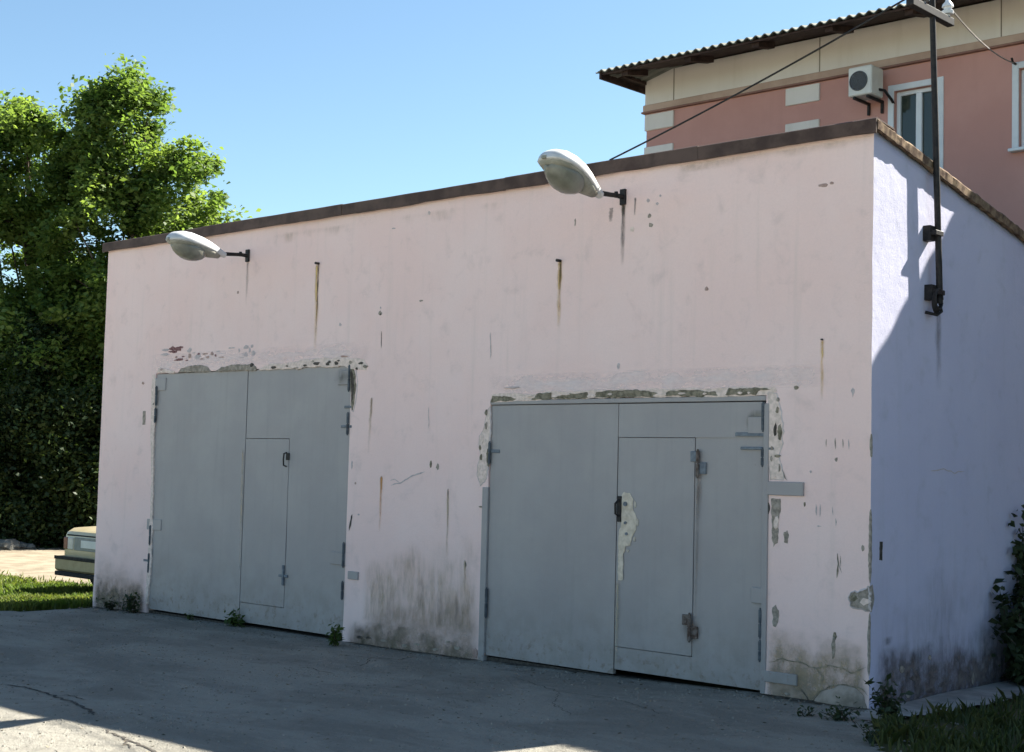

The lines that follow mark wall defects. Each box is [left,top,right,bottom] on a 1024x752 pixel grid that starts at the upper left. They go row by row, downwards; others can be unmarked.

spalling [142,345,368,604]
spalling [477,387,787,486]
peeling [617,492,639,580]
spalling [768,498,789,547]
spalling [848,509,883,675]
leakage [356,623,472,658]
leakage [772,647,861,701]
crack [773,658,863,700]